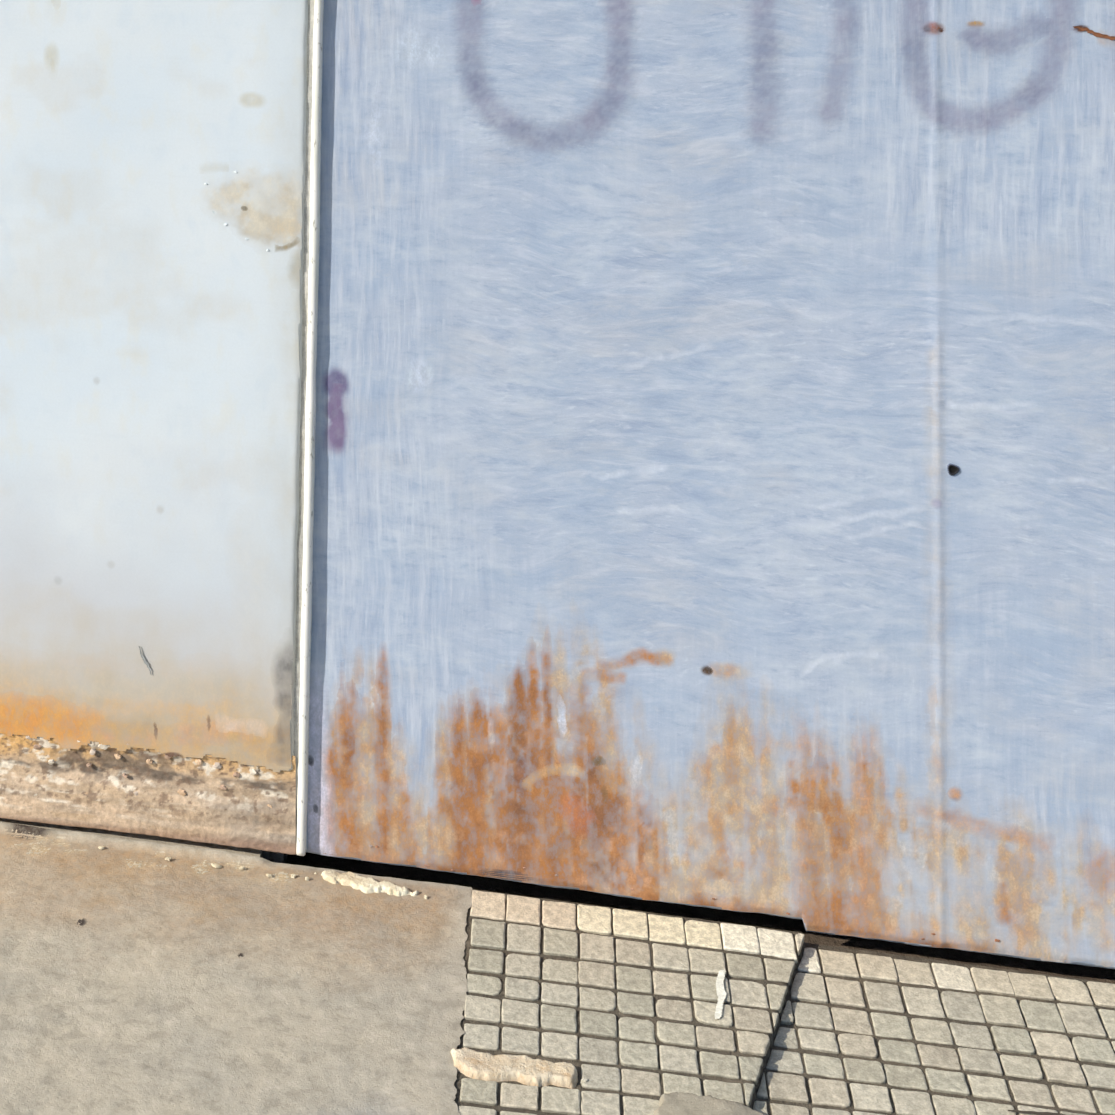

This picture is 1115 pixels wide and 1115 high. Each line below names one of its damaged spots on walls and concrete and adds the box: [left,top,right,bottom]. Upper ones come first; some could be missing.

rust [932,20,947,35]
flaking render [0,657,428,899]
rust [0,319,1115,1009]